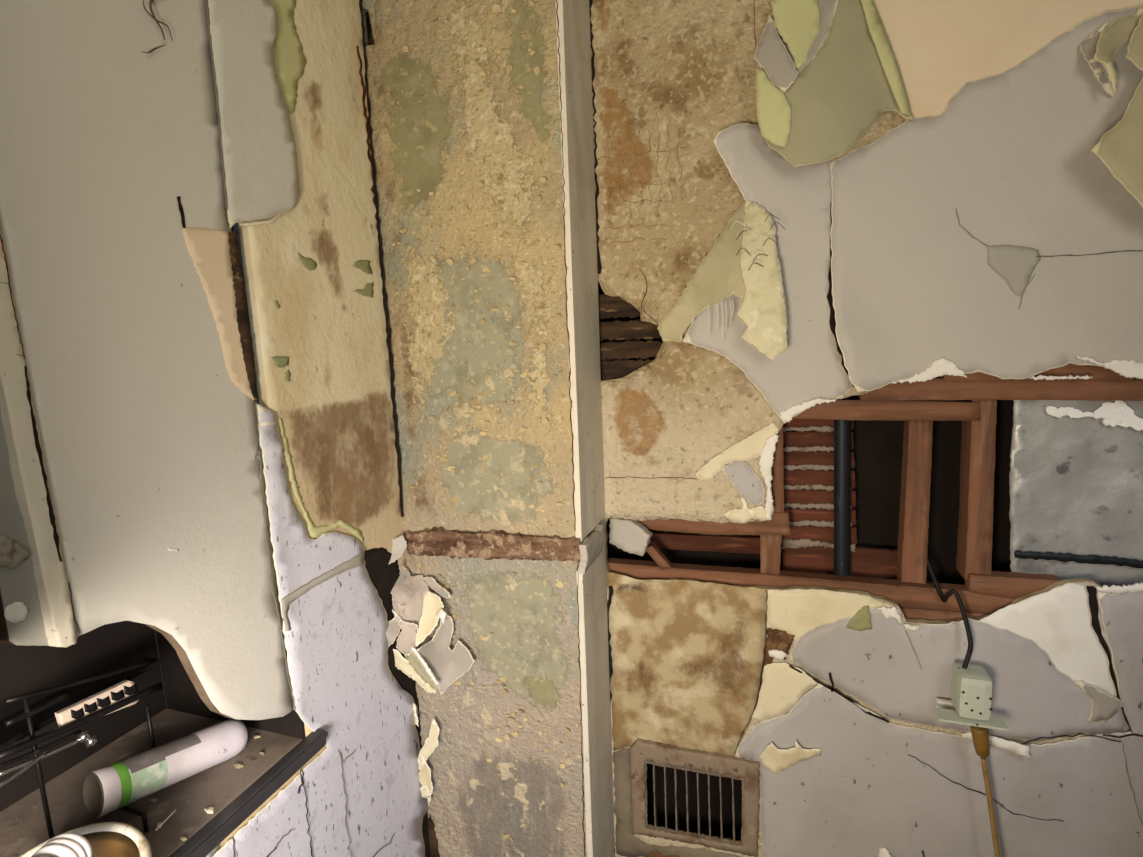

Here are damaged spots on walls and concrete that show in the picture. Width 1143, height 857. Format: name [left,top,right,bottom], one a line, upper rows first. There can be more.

peeling [208,0,306,228]
peeling [600,0,1143,572]
crack [1019,250,1133,308]
leakage [291,396,392,526]
spalling [607,518,761,568]
spalling [926,420,965,585]
peeling [213,404,507,857]
peeling [486,709,578,788]
crack [1022,586,1143,826]